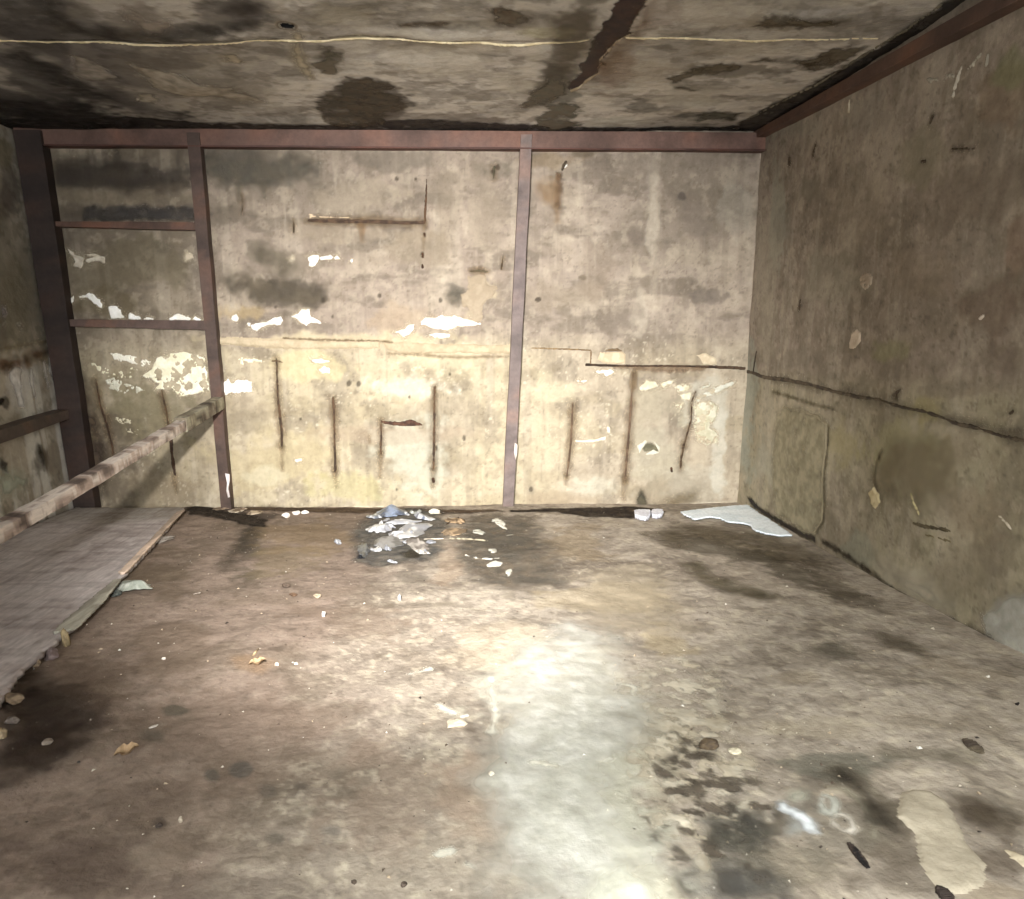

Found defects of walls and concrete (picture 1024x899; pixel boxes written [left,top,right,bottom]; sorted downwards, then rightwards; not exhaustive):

damp [312,47,407,127]
damp [667,63,741,91]
damp [796,46,868,71]
corrosion [308,179,427,237]
peeling [68,249,105,269]
peeling [395,315,481,339]
peeling [91,352,209,396]
corrosion [271,358,283,447]
corrosion [379,386,436,483]
corrosion [623,373,634,482]
peeling [640,380,736,445]
crack [531,347,1024,472]